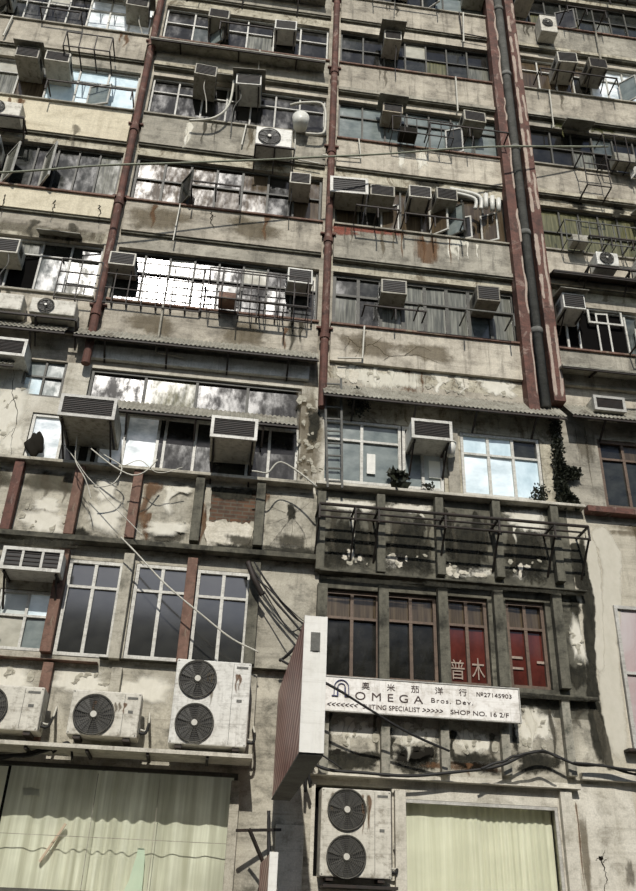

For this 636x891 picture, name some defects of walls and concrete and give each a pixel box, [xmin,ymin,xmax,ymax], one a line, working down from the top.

corrosion [417,235,437,264]
damp [288,322,304,350]
peeling [335,364,516,399]
peeling [17,497,67,533]
peeling [88,480,123,534]
peeling [146,486,191,535]
spalling [204,484,257,546]
peeling [446,563,492,578]
peeling [508,559,542,579]
peeling [391,722,437,761]
peeling [455,729,498,755]
peeling [514,706,555,751]